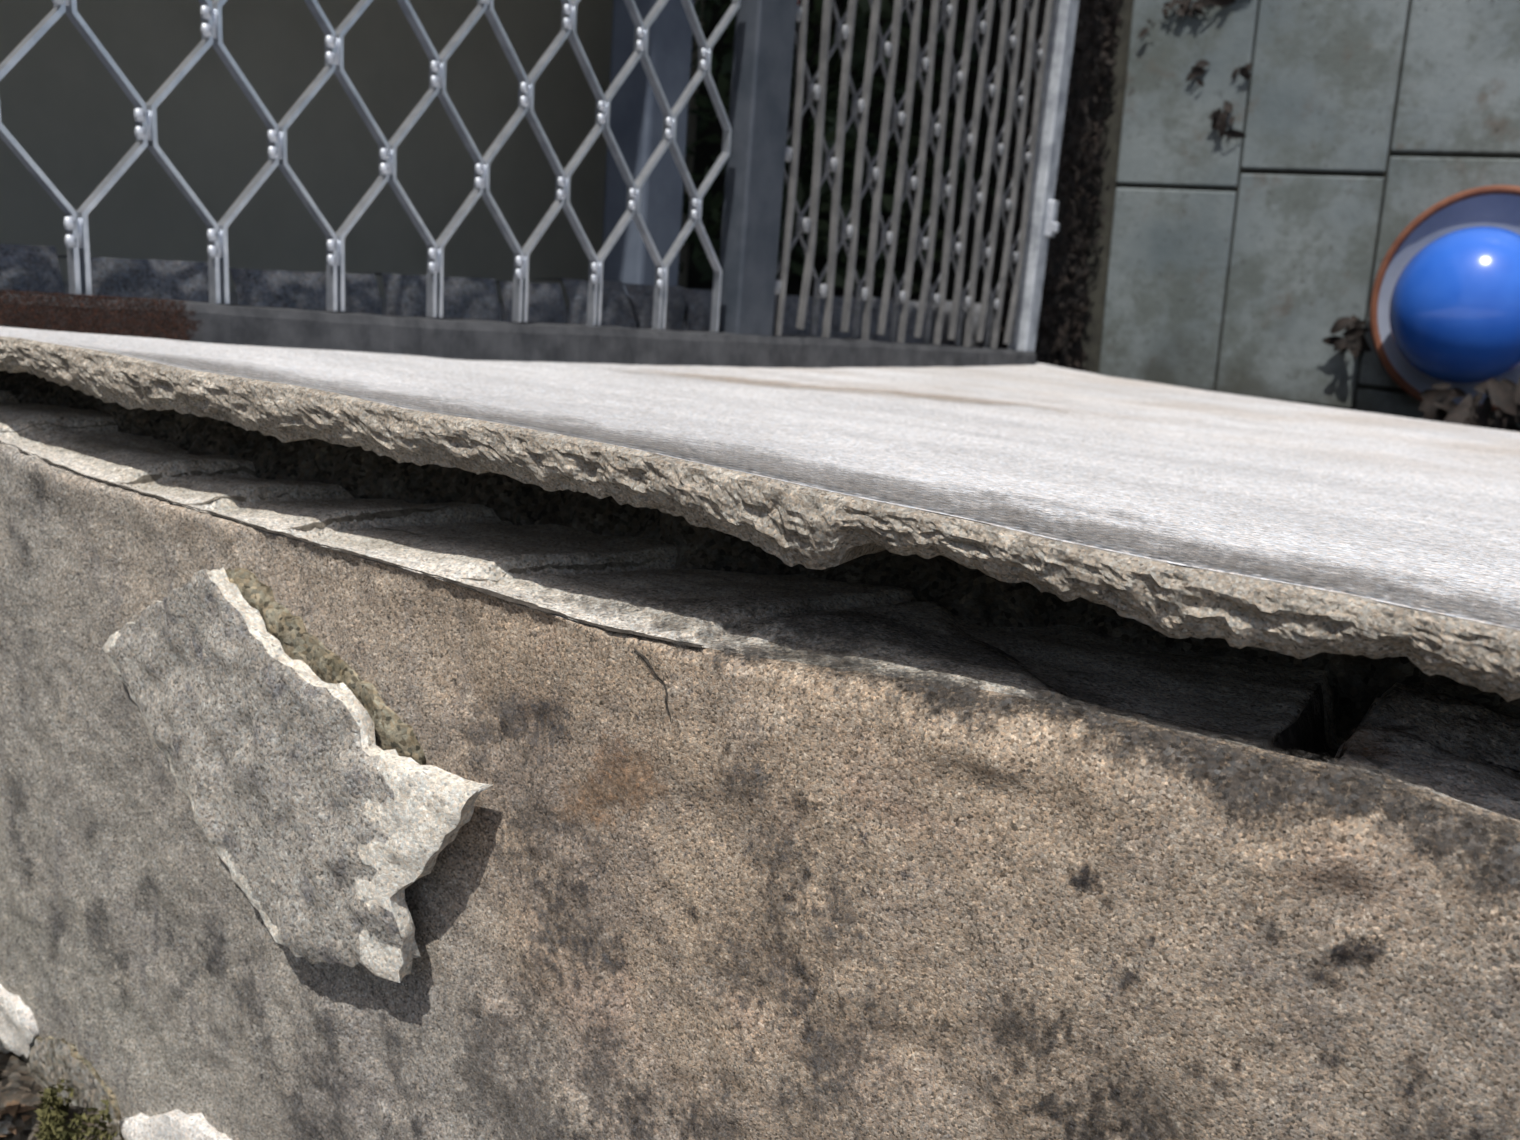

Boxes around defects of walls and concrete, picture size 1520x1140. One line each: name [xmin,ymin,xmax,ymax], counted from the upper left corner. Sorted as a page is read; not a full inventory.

corrosion [0,290,202,341]
crack [0,370,1520,763]
water stain [545,589,1520,908]
water stain [701,828,907,1136]
water stain [1308,934,1386,988]
water stain [994,988,1071,1074]
water stain [1024,1048,1196,1140]
water stain [1319,1053,1343,1067]